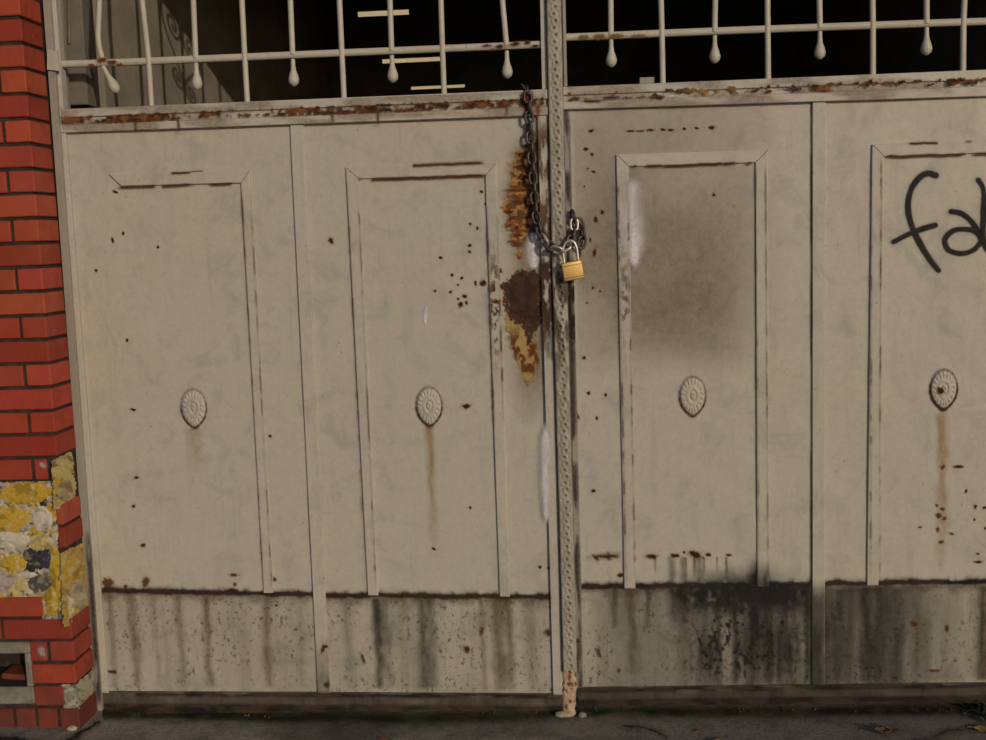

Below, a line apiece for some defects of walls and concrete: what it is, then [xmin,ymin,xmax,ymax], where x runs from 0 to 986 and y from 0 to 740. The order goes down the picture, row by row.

corrosion [61,97,545,130]
corrosion [568,77,986,103]
corrosion [449,128,554,381]
corrosion [567,281,588,339]
spalling [0,452,88,627]
water stain [373,599,383,686]
water stain [670,566,904,686]